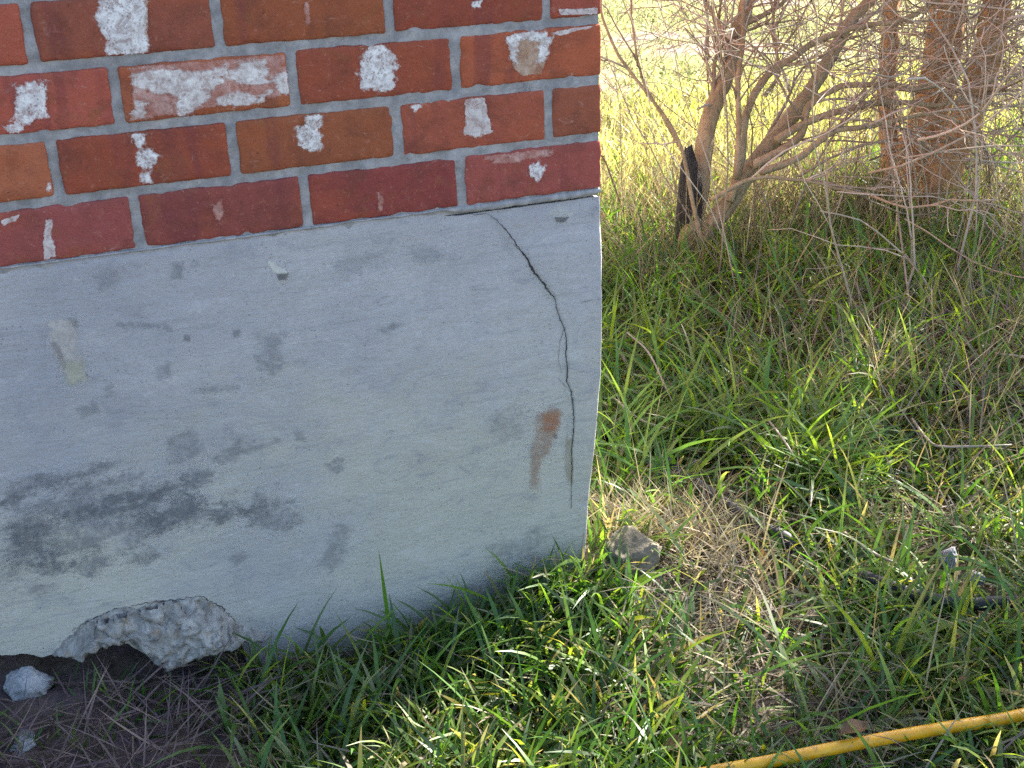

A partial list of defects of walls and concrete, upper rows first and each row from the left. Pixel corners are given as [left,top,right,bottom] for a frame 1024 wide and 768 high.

crack [470,212,590,509]
spalling [52,596,270,672]